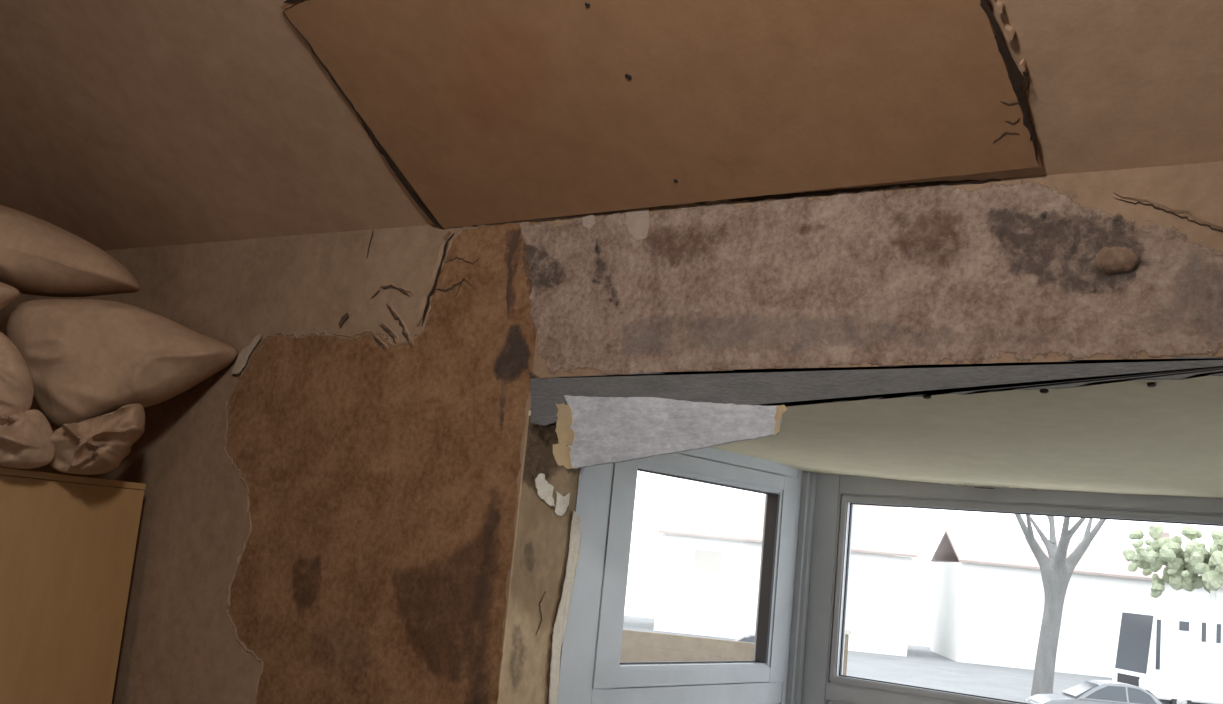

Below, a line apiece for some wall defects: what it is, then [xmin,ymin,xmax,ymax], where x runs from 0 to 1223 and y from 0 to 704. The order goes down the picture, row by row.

crack [283,0,1001,326]
crack [980,0,1040,165]
damp [646,227,725,266]
damp [988,209,1145,291]
damp [495,325,538,381]
peeling [224,179,1223,704]